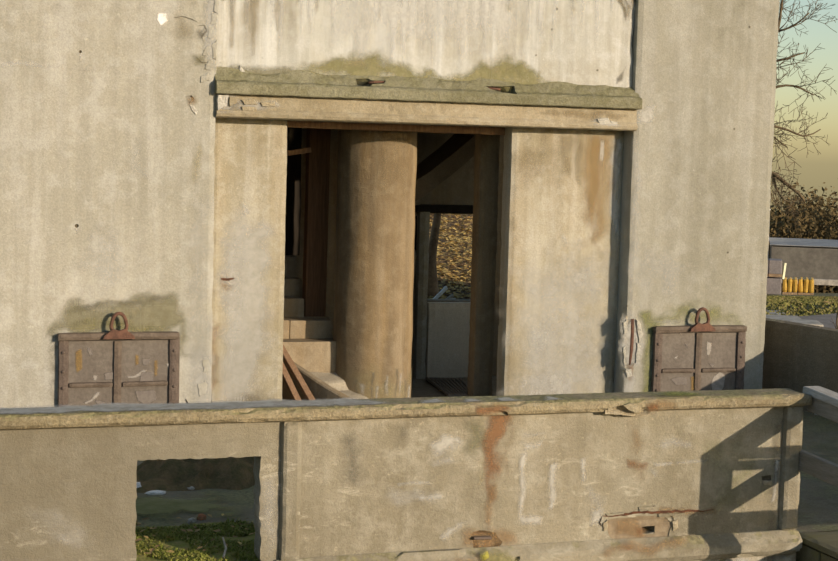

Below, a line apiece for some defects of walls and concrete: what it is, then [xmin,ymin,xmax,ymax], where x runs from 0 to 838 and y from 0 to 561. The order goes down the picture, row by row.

spalling [157,0,219,83]
water stain [51,295,185,339]
spalling [622,317,643,378]
corrosion [477,407,507,478]
spalling [602,516,679,540]